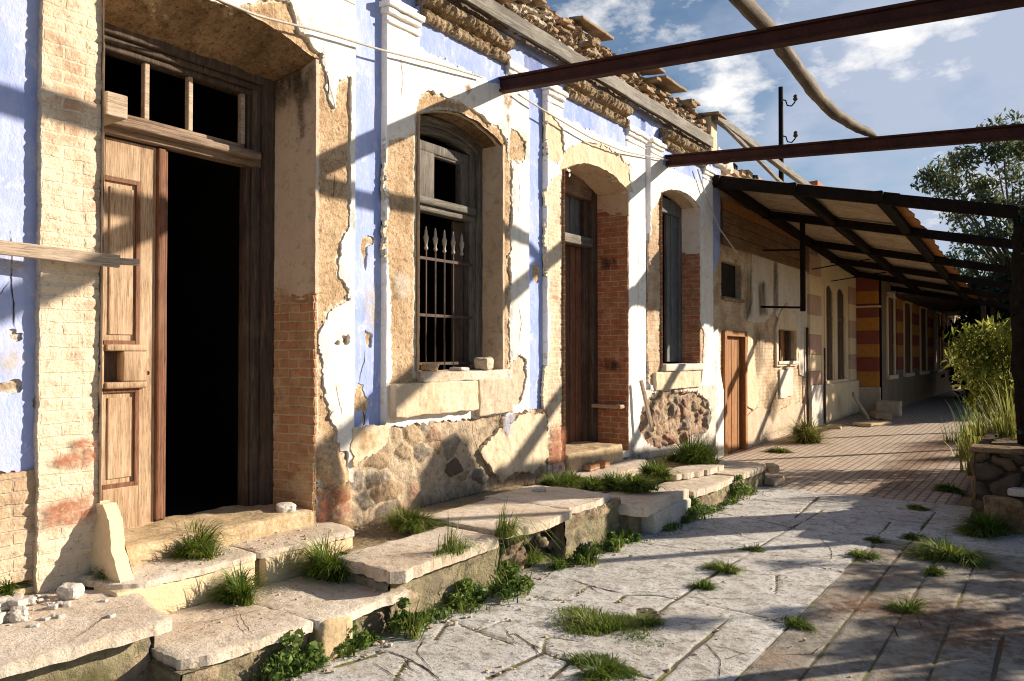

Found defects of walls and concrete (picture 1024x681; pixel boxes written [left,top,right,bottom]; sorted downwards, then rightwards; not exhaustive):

peeling [48,497,92,527]
peeling [55,439,95,466]
flaking render [239,0,355,522]
peeling [354,383,369,426]
flaking render [360,91,529,405]
flaking render [532,111,633,472]
flaking render [639,189,713,448]